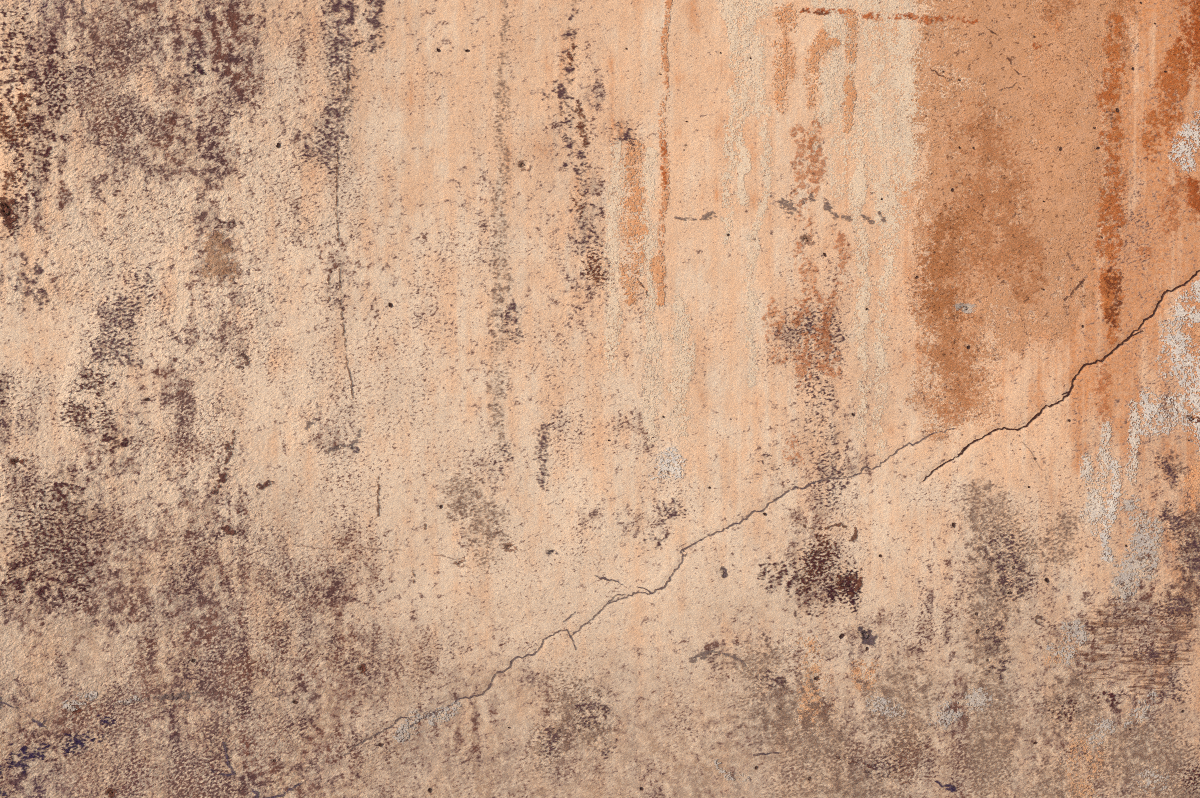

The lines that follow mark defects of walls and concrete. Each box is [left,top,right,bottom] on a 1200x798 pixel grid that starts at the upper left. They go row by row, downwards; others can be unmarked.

water stain [0,7,78,240]
water stain [299,0,387,175]
rust [1142,0,1200,234]
water stain [10,259,50,310]
water stain [0,471,108,612]
water stain [53,264,154,454]
crack [343,270,1200,756]
water stain [757,534,862,618]
water stain [984,525,1033,601]
rust [1094,14,1151,429]
water stain [1078,276,1200,603]
rust [1179,455,1200,514]